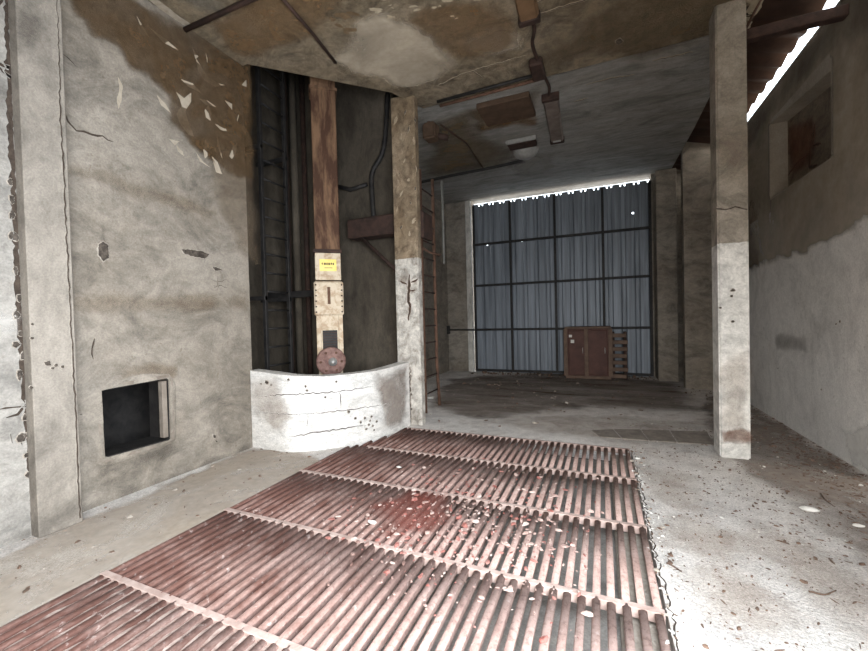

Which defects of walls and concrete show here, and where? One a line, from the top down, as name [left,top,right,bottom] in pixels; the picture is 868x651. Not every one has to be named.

crack [0,61,11,79]
spalling [1,0,34,521]
spalling [97,241,110,262]
crack [400,275,418,320]
crack [251,386,386,437]
leakage [379,370,405,424]